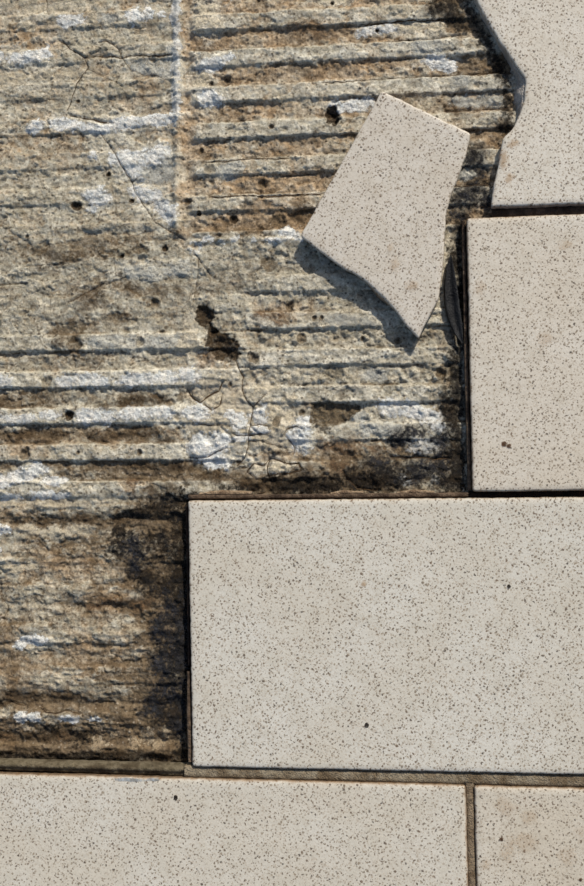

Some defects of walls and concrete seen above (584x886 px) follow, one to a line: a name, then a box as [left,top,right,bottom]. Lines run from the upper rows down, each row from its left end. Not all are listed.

water stain [355,0,515,133]
hole [325,105,340,126]
efflorescence [327,95,375,114]
crack [59,40,213,297]
hole [263,257,278,272]
spalling [195,305,259,362]
water stain [55,142,492,494]
water stain [0,373,26,395]
water stain [0,403,68,440]
crack [188,360,301,478]
spalling [309,398,361,428]
water stain [0,461,194,761]